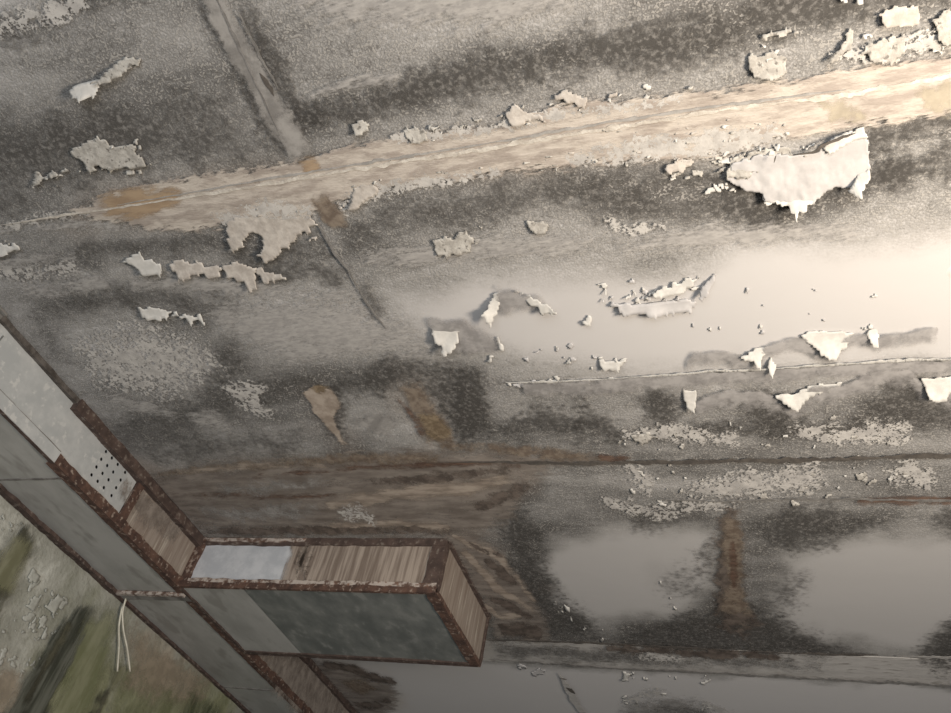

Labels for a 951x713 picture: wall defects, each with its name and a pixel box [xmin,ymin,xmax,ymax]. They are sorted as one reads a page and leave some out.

damp [0,93,251,203]
flaking render [32,5,951,293]
damp [865,81,951,192]
corrosion [103,188,179,220]
damp [352,167,857,251]
peeling [137,306,205,327]
peeling [597,274,716,327]
peeling [506,319,951,420]
corrosion [121,480,180,541]
damp [0,231,951,672]
peeling [825,455,909,499]
corrosion [712,504,762,637]